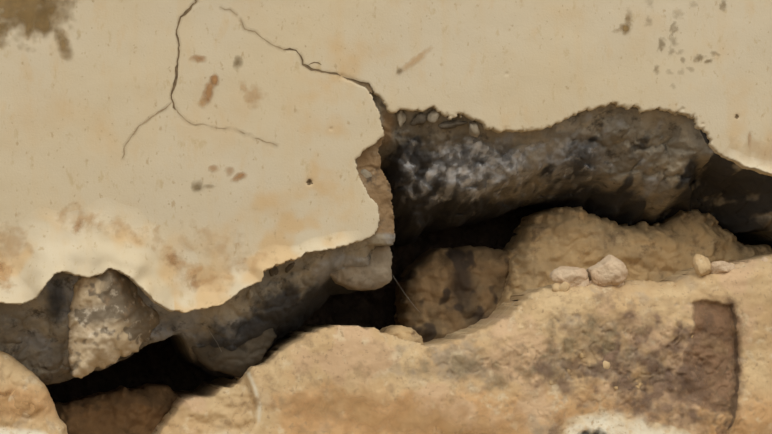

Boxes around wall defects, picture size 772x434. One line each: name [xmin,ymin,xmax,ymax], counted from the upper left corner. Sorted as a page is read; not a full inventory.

leakage [0,0,70,53]
crack [122,0,275,158]
crack [223,8,372,93]
spalling [0,92,772,434]